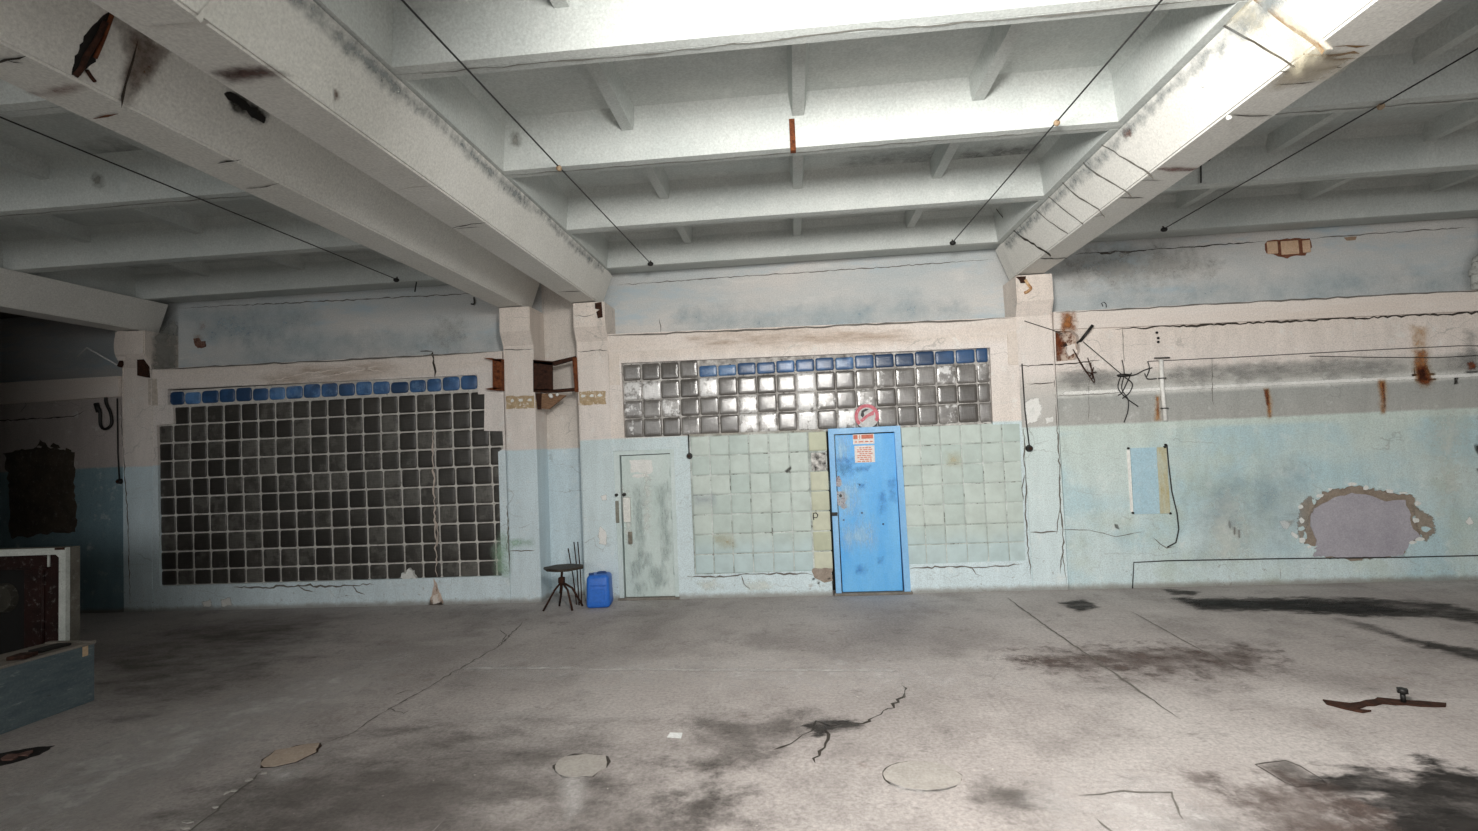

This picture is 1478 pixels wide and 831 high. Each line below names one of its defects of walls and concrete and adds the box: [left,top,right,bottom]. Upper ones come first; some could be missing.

flaking render [1265,238,1312,259]
rust [1063,313,1074,329]
rust [1416,330,1431,384]
spalling [1280,482,1435,561]